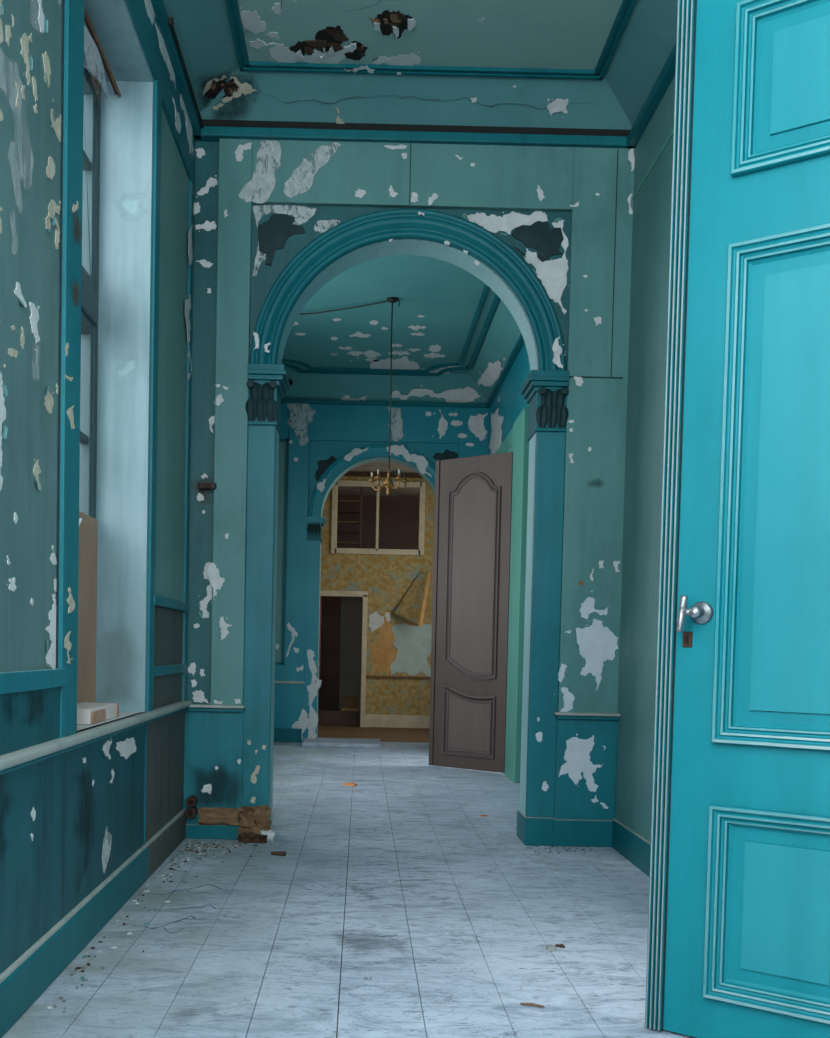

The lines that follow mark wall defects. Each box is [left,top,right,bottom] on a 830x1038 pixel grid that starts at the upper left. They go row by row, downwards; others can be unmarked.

peeling [237,7,421,76]
peeling [203,73,257,110]
peeling [235,140,341,233]
peeling [252,242,266,276]
peeling [462,185,569,314]
peeling [0,282,73,491]
peeling [67,406,75,429]
peeling [194,562,232,640]
flaking render [368,611,432,677]
peeling [554,560,620,712]
peeling [102,736,136,783]
peeling [542,734,608,809]